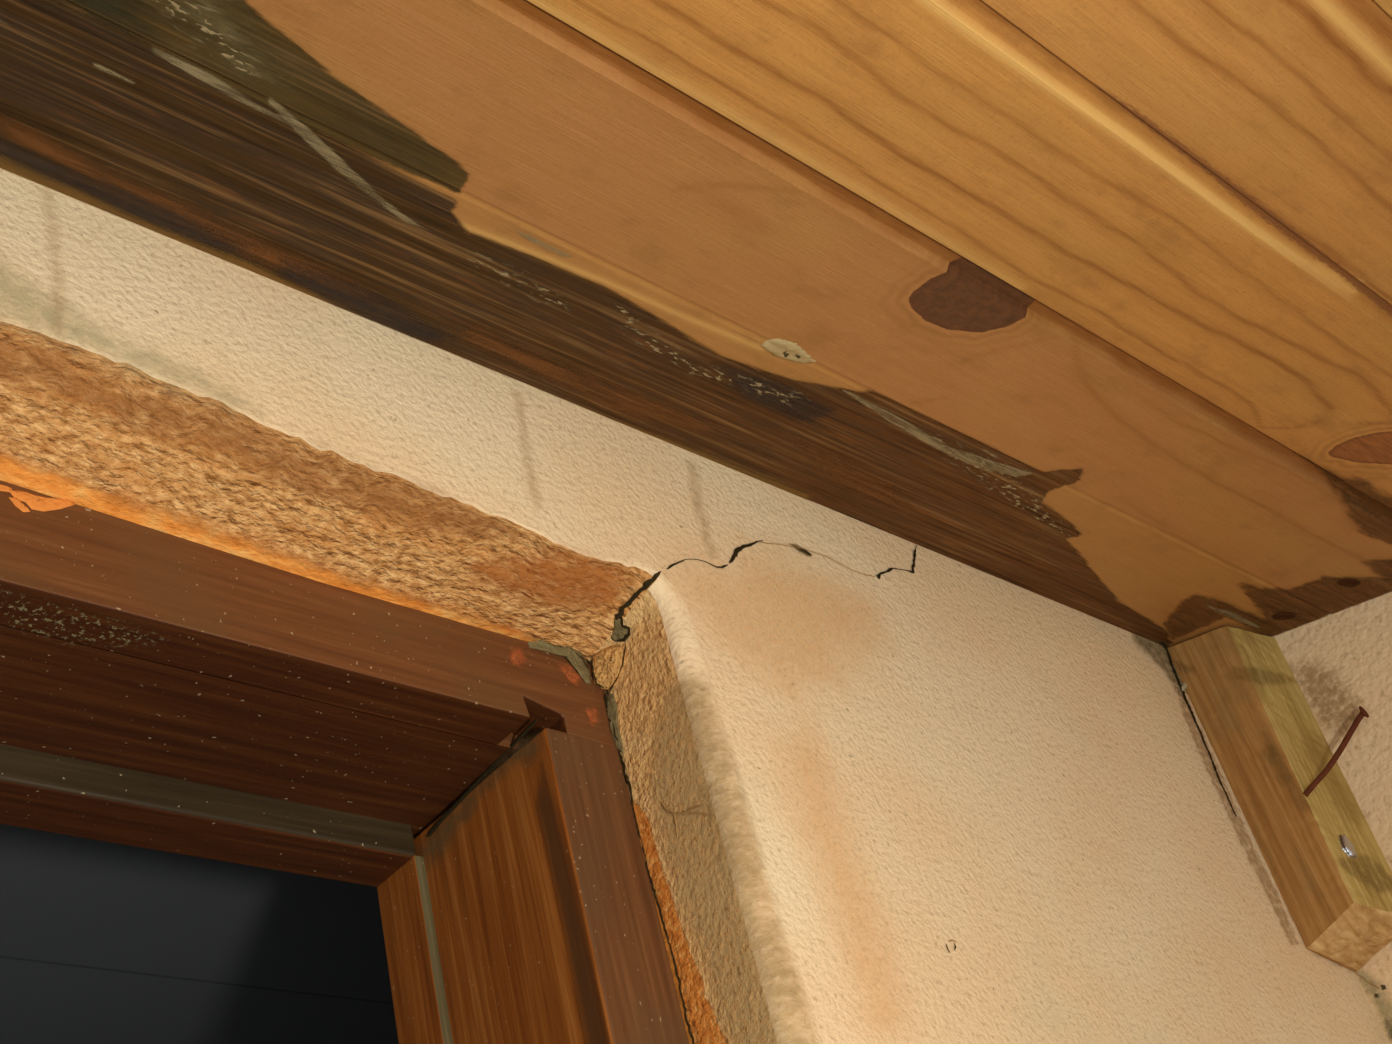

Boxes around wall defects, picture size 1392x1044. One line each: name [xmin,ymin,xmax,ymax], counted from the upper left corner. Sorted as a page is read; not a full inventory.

water stain [0,0,1392,646]
crack [615,540,917,621]
mould [1354,971,1392,1038]